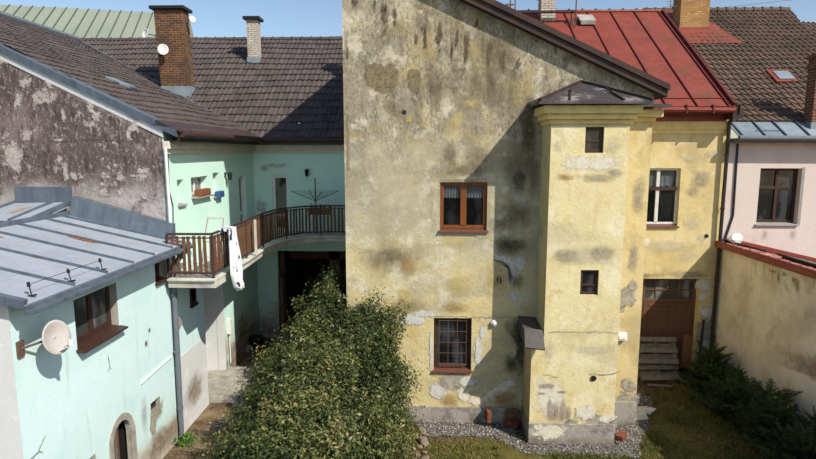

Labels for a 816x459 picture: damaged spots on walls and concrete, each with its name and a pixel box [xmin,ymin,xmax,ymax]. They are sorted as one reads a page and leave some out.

water stain [374,0,397,36]
water stain [415,22,443,57]
water stain [451,18,478,64]
water stain [487,43,522,72]
water stain [521,108,534,150]
peeling [562,141,623,171]
water stain [497,240,520,253]
peeling [620,279,638,313]
peeling [396,311,436,325]
peeling [473,326,486,366]
spalling [429,373,517,406]
peeling [532,378,618,441]